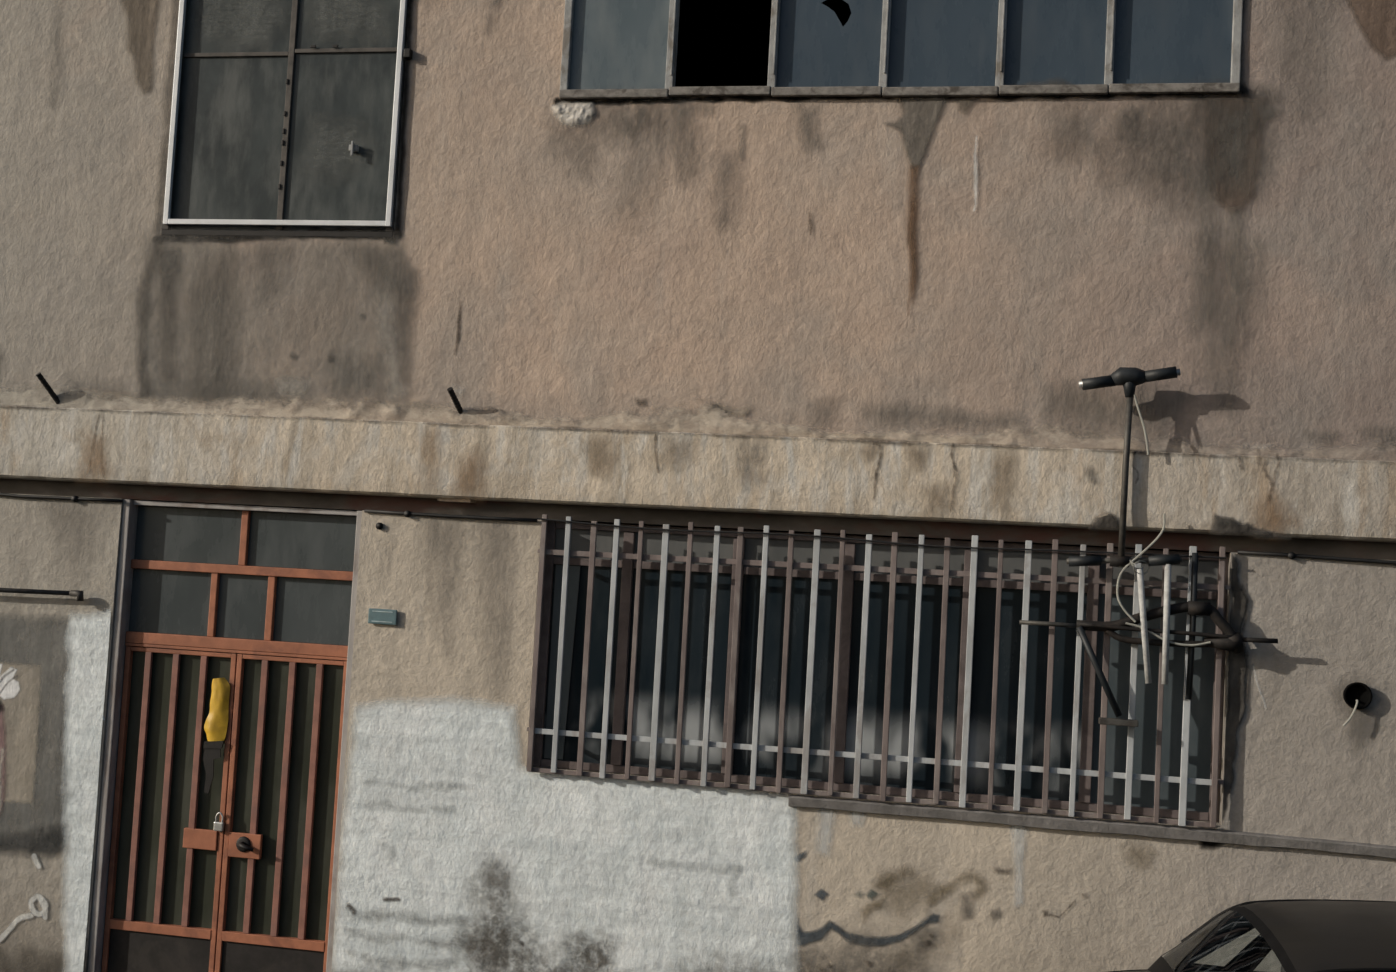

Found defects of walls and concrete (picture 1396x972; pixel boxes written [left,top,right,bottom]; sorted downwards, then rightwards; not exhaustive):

leakage [122,0,157,91]
corrosion [908,167,917,299]
crack [528,427,670,469]
crack [827,439,1049,490]
crack [1094,449,1315,502]
leakage [466,887,562,972]
leakage [582,947,606,966]